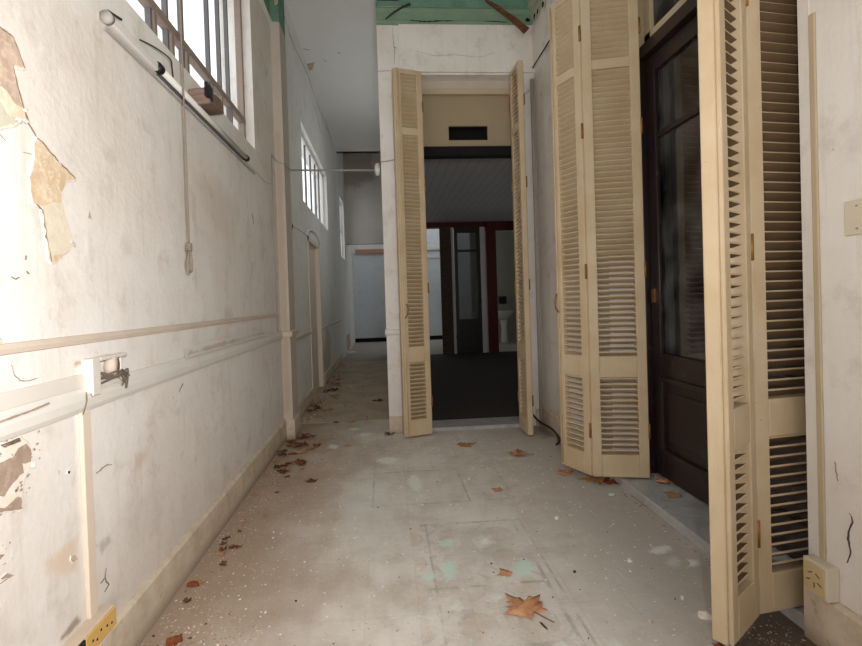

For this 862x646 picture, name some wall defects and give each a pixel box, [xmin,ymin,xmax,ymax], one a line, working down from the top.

peeling [0,27,30,131]
peeling [26,136,76,265]
peeling [0,430,41,516]
crack [846,513,854,563]